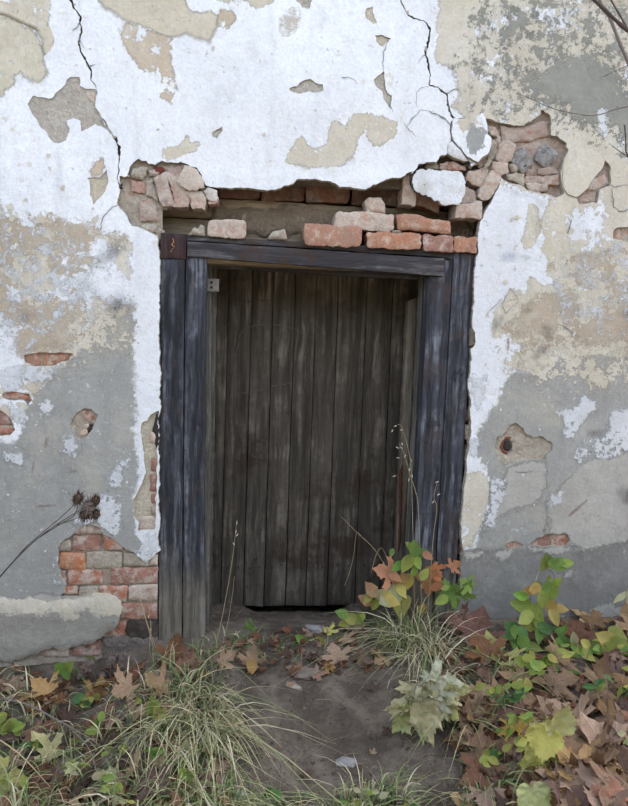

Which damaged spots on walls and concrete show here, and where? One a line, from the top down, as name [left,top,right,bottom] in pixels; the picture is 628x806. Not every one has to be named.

peeling [0,0,54,98]
flaking render [28,77,116,143]
crack [70,0,95,85]
peeling [96,0,274,105]
peeling [285,73,398,168]
crack [400,1,460,142]
crack [100,137,131,230]
flaking render [118,135,220,239]
peeling [396,0,628,375]
peeling [0,158,136,440]
flaking render [133,411,161,530]
flaking render [0,524,159,667]